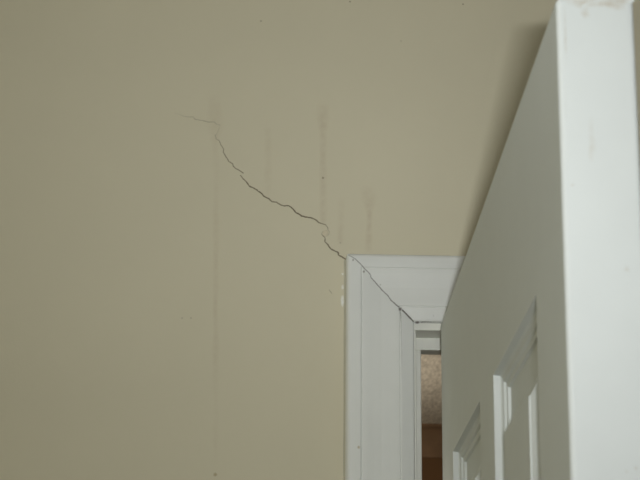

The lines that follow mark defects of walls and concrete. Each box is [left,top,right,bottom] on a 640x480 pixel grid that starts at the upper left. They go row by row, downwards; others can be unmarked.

crack [175,113,431,380]